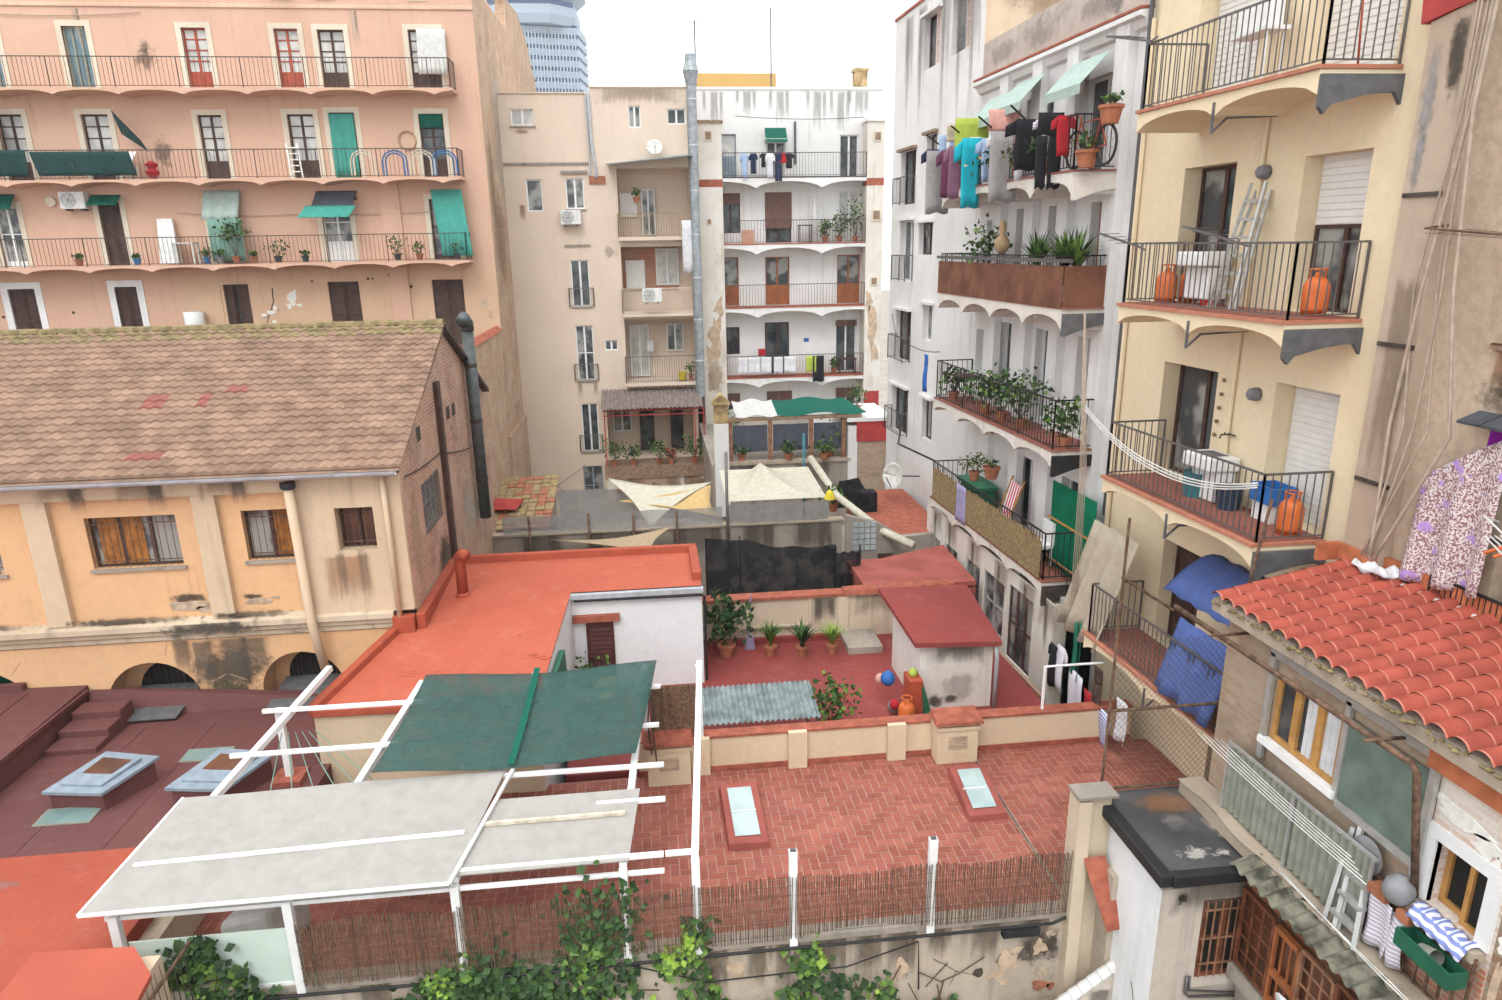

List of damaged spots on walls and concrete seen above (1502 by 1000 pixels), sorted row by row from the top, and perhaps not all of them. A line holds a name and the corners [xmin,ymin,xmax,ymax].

leakage [1448,19,1468,87]
spalling [706,296,724,365]
leakage [67,610,283,689]
leakage [929,695,957,707]